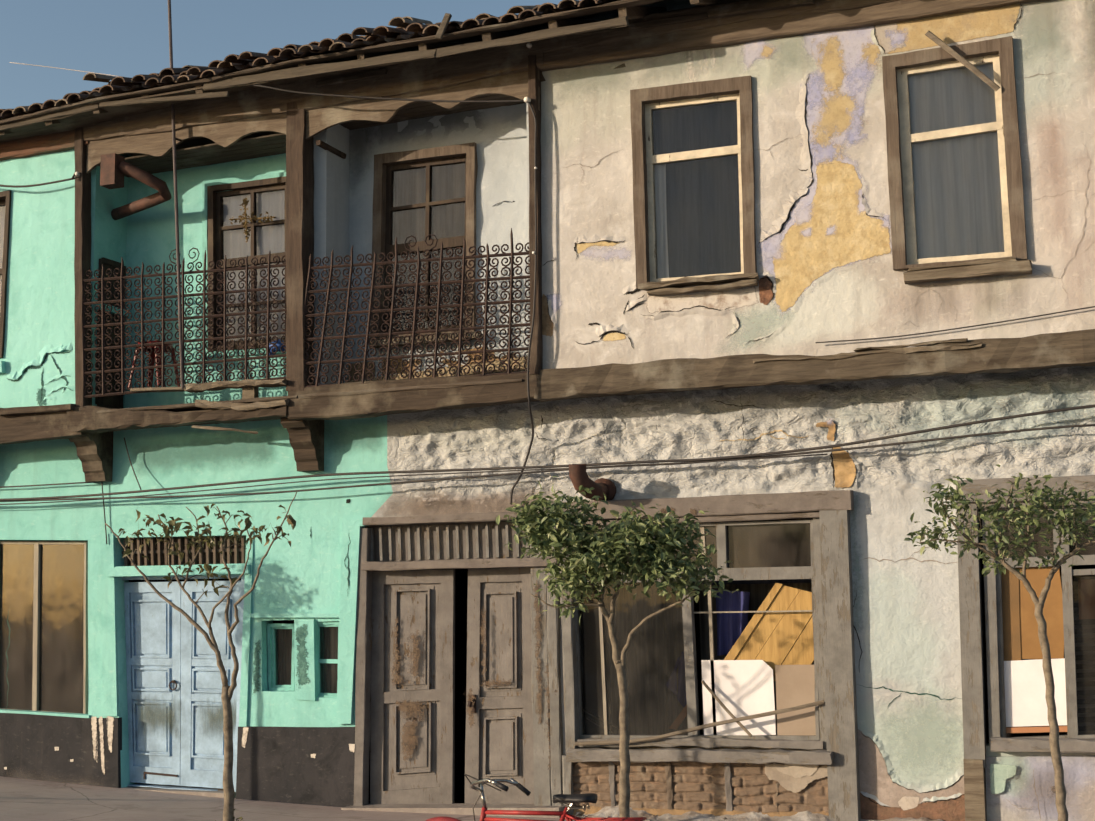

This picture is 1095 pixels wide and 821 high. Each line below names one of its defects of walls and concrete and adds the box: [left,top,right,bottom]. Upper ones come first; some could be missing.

peeling [638,3,1022,346]
peeling [574,233,629,259]
crack [1034,151,1095,296]
peeling [577,324,633,347]
crack [7,342,72,403]
peeling [816,419,863,489]
crack [857,684,959,709]
peeling [91,716,114,774]
spalling [858,728,965,821]